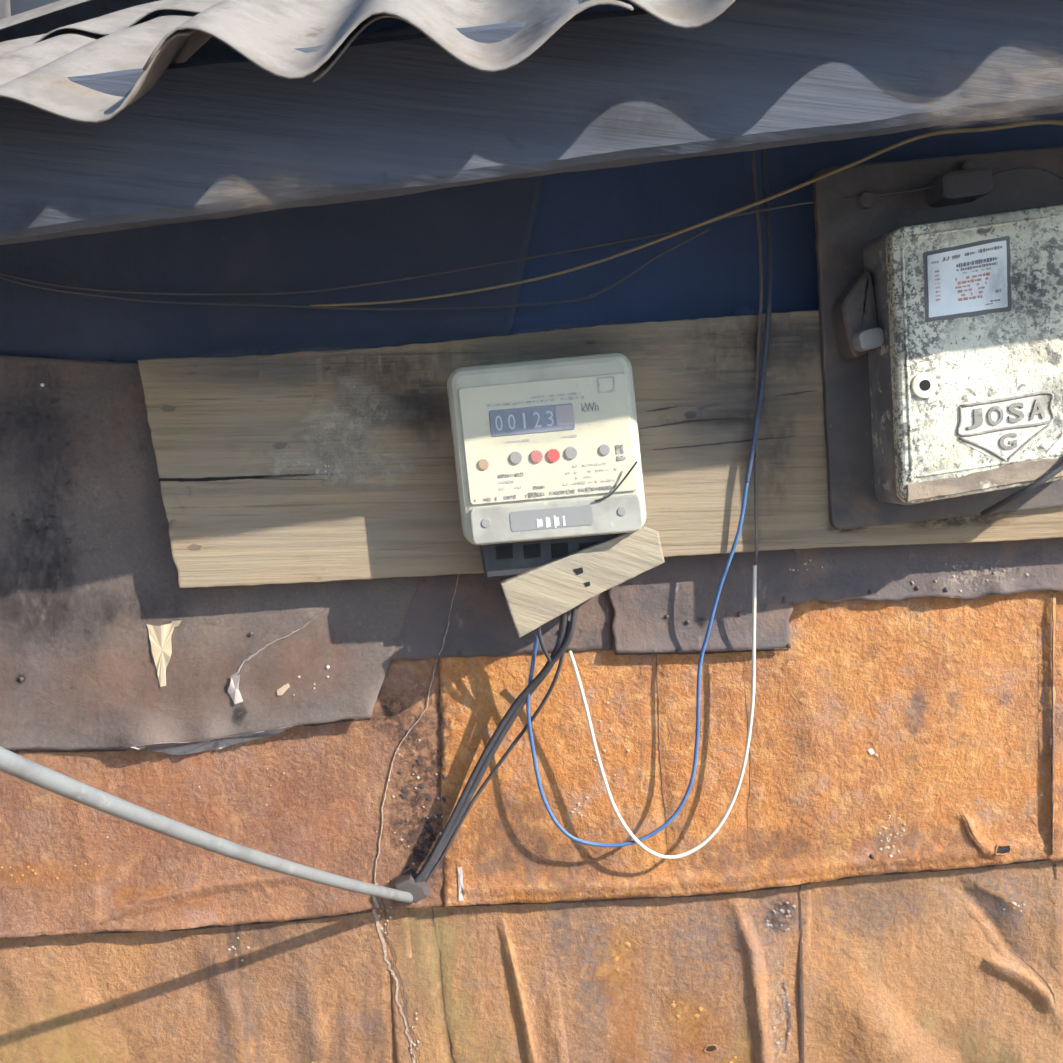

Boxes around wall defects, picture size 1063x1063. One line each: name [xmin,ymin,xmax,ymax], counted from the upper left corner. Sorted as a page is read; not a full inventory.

crack [158,473,343,482]
corrosion [304,718,370,726]
corrosion [389,759,447,855]
corrosion [443,594,1057,1063]
corrosion [39,910,372,936]
crack [372,883,420,1063]
crack [431,907,456,1063]